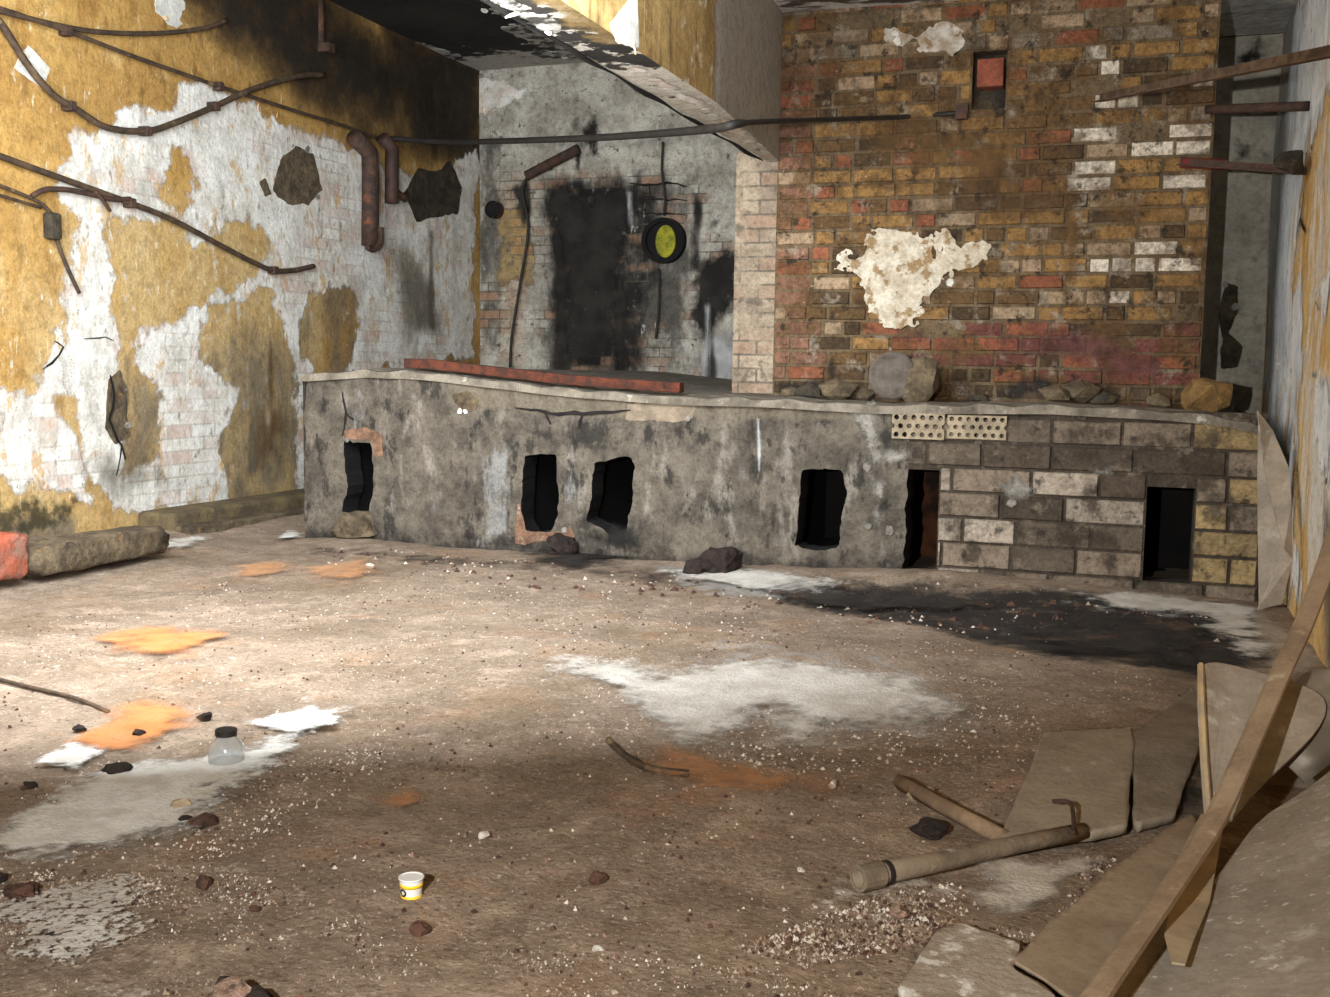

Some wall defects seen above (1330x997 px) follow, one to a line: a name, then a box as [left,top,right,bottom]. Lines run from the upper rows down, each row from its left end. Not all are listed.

peeling [481,0,590,60]
peeling [478,73,532,116]
peeling [0,79,480,514]
peeling [494,199,535,287]
damp [553,233,571,370]
damp [701,306,733,379]
flaking render [834,228,992,329]
peeling [1264,0,1330,604]